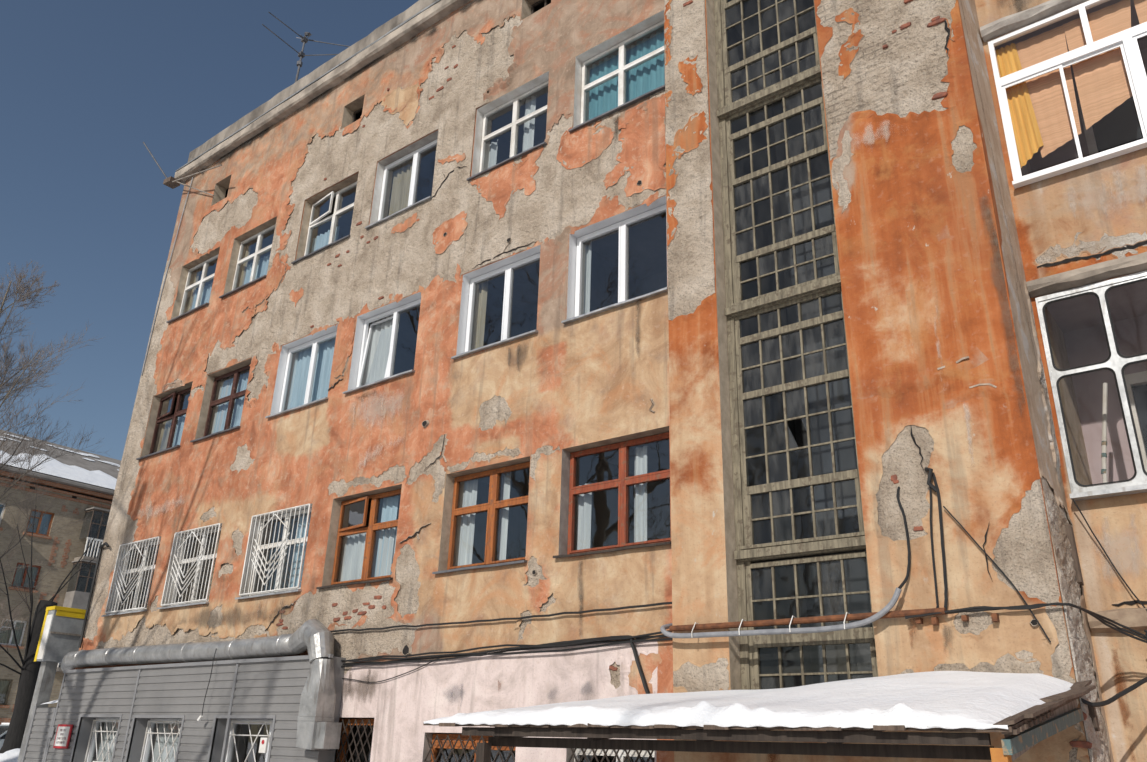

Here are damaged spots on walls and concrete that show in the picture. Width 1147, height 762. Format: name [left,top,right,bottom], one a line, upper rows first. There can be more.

spalling [817,0,984,214]
crack [430,166,466,200]
crack [944,8,1147,384]
spalling [82,0,715,675]
crack [401,523,430,543]
spalling [871,419,942,548]
crack [910,427,924,470]
crack [983,524,993,582]
spalling [890,280,1111,762]